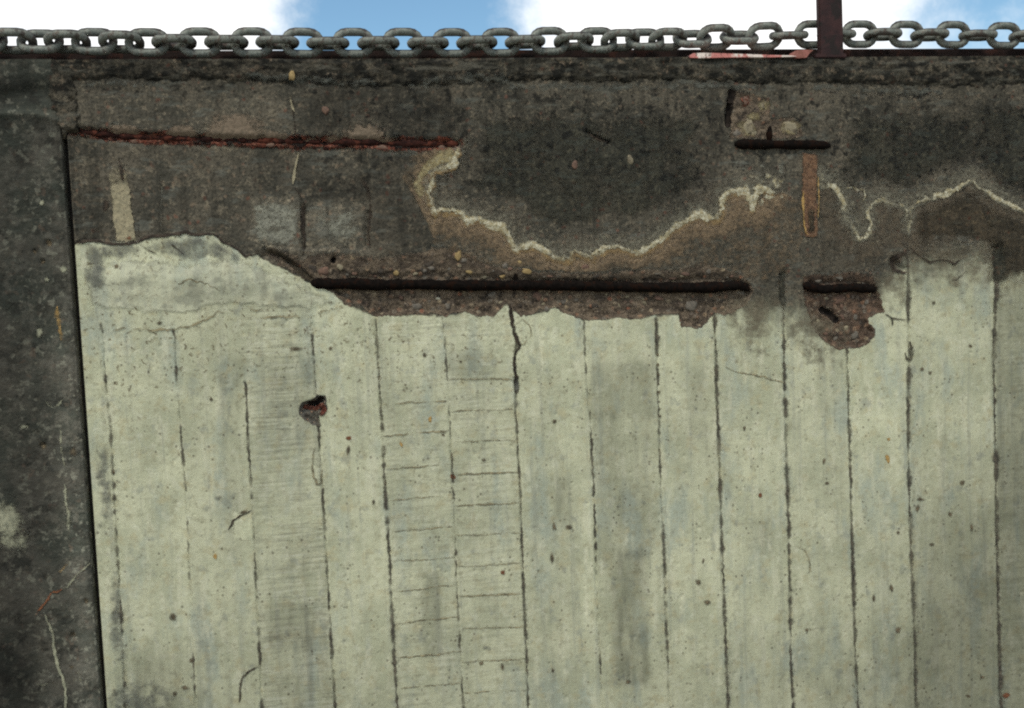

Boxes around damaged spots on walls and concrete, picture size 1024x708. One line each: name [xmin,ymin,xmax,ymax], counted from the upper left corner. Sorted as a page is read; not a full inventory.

corrosion [70,114,464,153]
water stain [475,112,695,225]
corrosion [801,153,820,237]
water stain [817,109,1024,281]
water stain [403,142,801,336]
spalling [255,247,754,329]
spalling [803,271,885,350]
spalling [299,394,327,426]
crack [384,304,532,442]